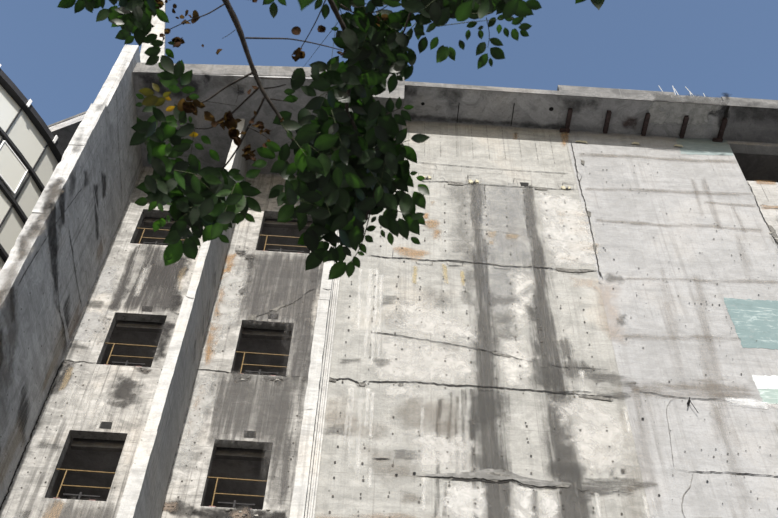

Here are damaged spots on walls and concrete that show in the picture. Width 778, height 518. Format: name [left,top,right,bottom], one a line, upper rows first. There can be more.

crack [371,142,603,284]
crack [748,183,778,244]
leakage [0,178,64,319]
leakage [62,300,88,349]
leakage [436,184,514,518]
leakage [524,187,656,518]
leakage [18,390,28,434]
leakage [51,365,77,418]
leakage [81,377,136,429]
crack [329,377,778,517]
spalling [162,501,286,518]